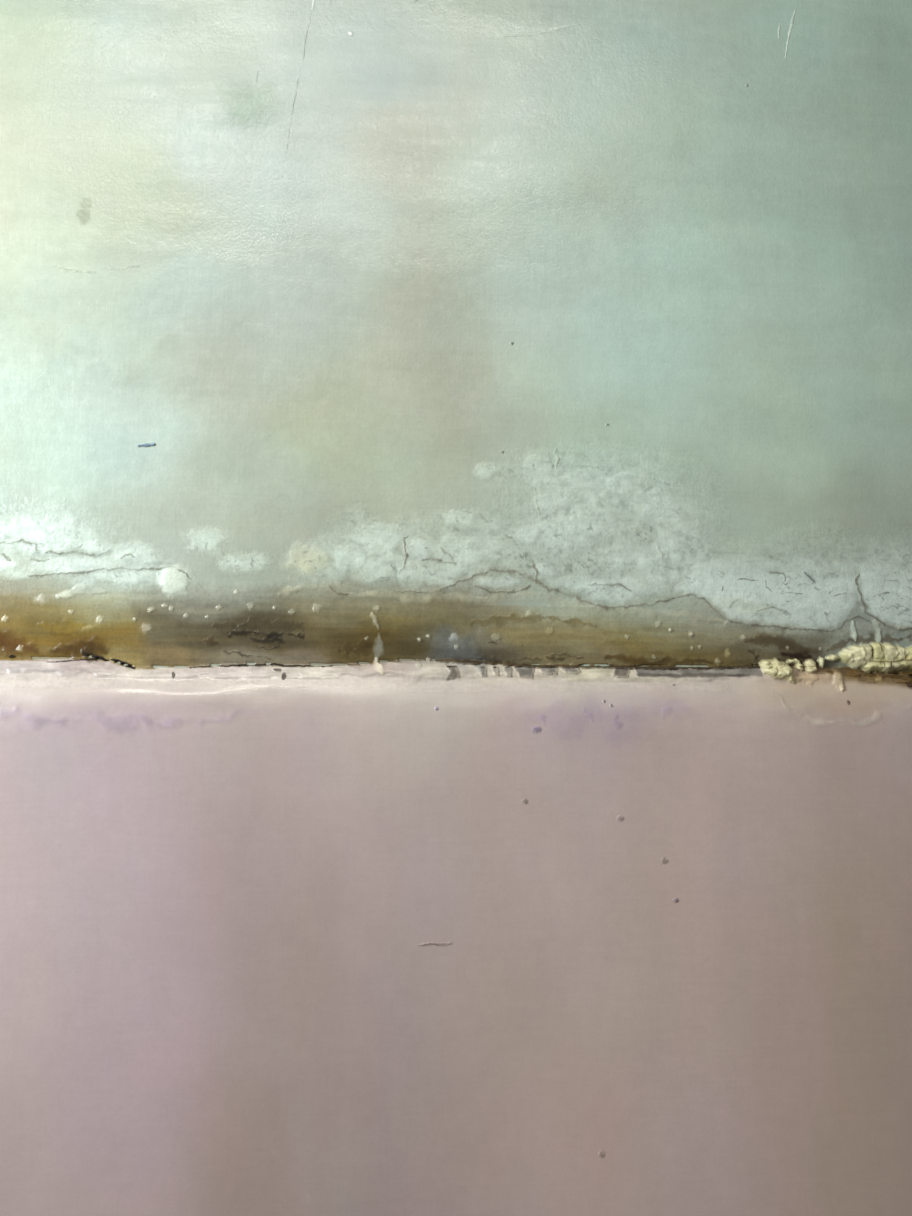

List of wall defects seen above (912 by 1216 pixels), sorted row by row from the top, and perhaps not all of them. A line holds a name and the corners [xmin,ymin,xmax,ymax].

crack [0,536,191,580]
water stain [119,580,503,675]
crack [391,536,912,669]